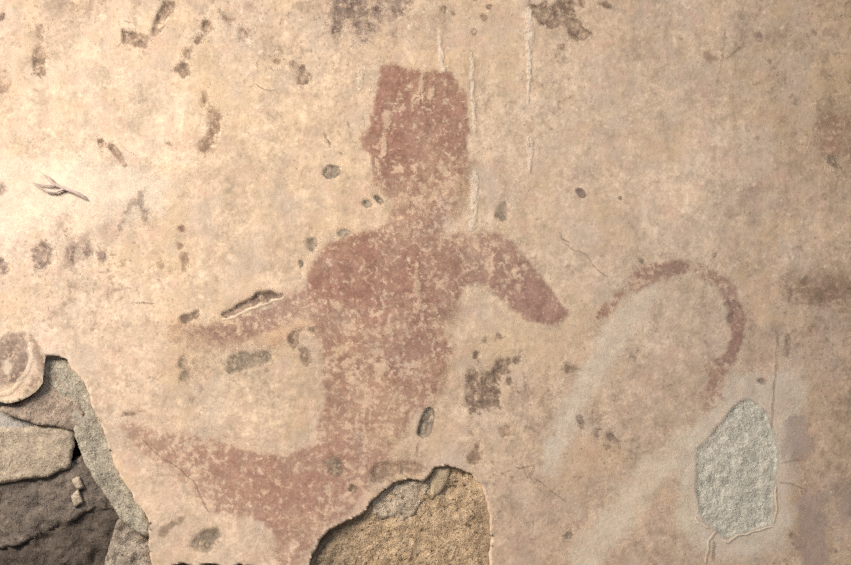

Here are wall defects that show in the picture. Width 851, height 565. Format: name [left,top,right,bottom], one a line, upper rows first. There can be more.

spalling [226,351,270,372]
spalling [288,327,314,366]
spalling [417,407,434,438]
spalling [0,333,152,565]
spalling [310,442,491,565]
spalling [195,527,220,552]